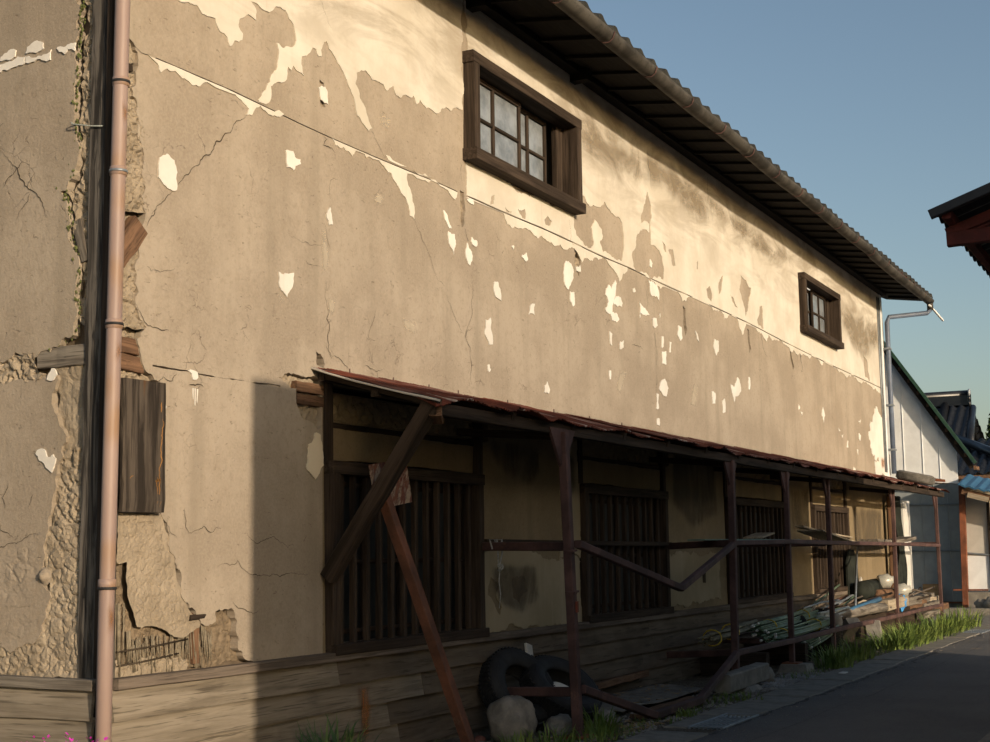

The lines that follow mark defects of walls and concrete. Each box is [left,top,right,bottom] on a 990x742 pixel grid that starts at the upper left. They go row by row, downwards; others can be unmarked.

crack [4,157,45,218]
spalling [0,0,93,249]
spalling [125,73,149,221]
peeling [148,0,886,395]
damp [583,133,712,214]
damp [844,315,877,349]
spalling [121,370,150,381]
peeling [279,374,324,480]
peeling [656,379,668,426]
peeling [712,377,751,413]
peeling [838,406,891,477]